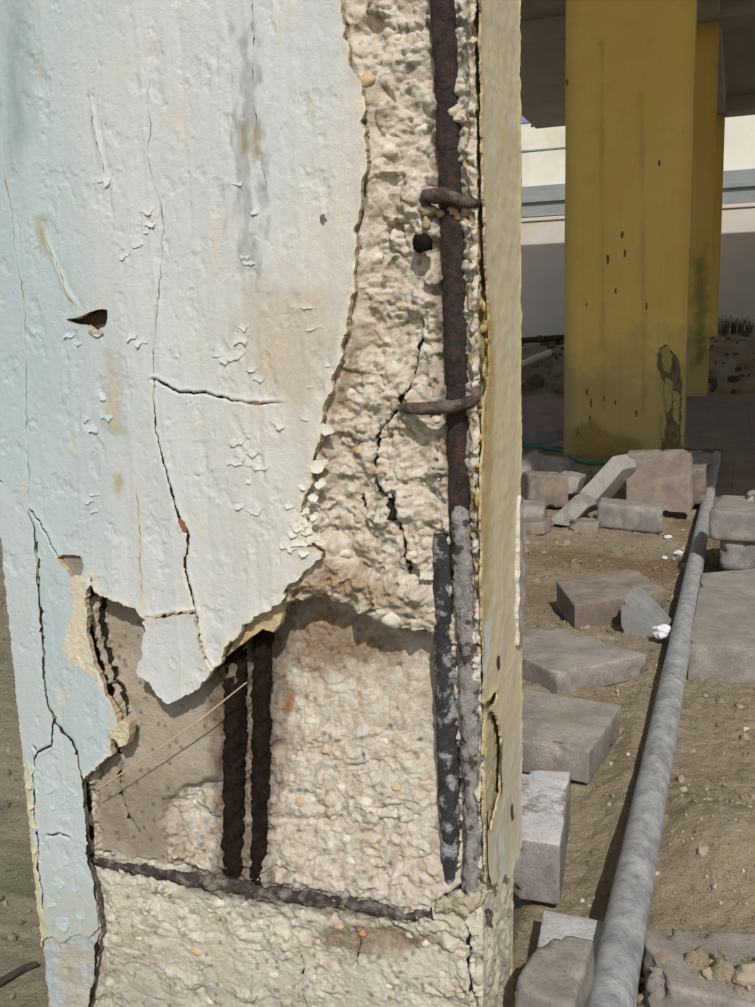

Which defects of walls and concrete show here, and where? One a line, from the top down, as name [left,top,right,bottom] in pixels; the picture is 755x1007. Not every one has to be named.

spalling [25,0,503,1007]
crack [361,322,424,574]
peeling [514,496,526,647]
peeling [657,344,683,451]
crack [98,597,129,716]
crack [117,747,132,819]